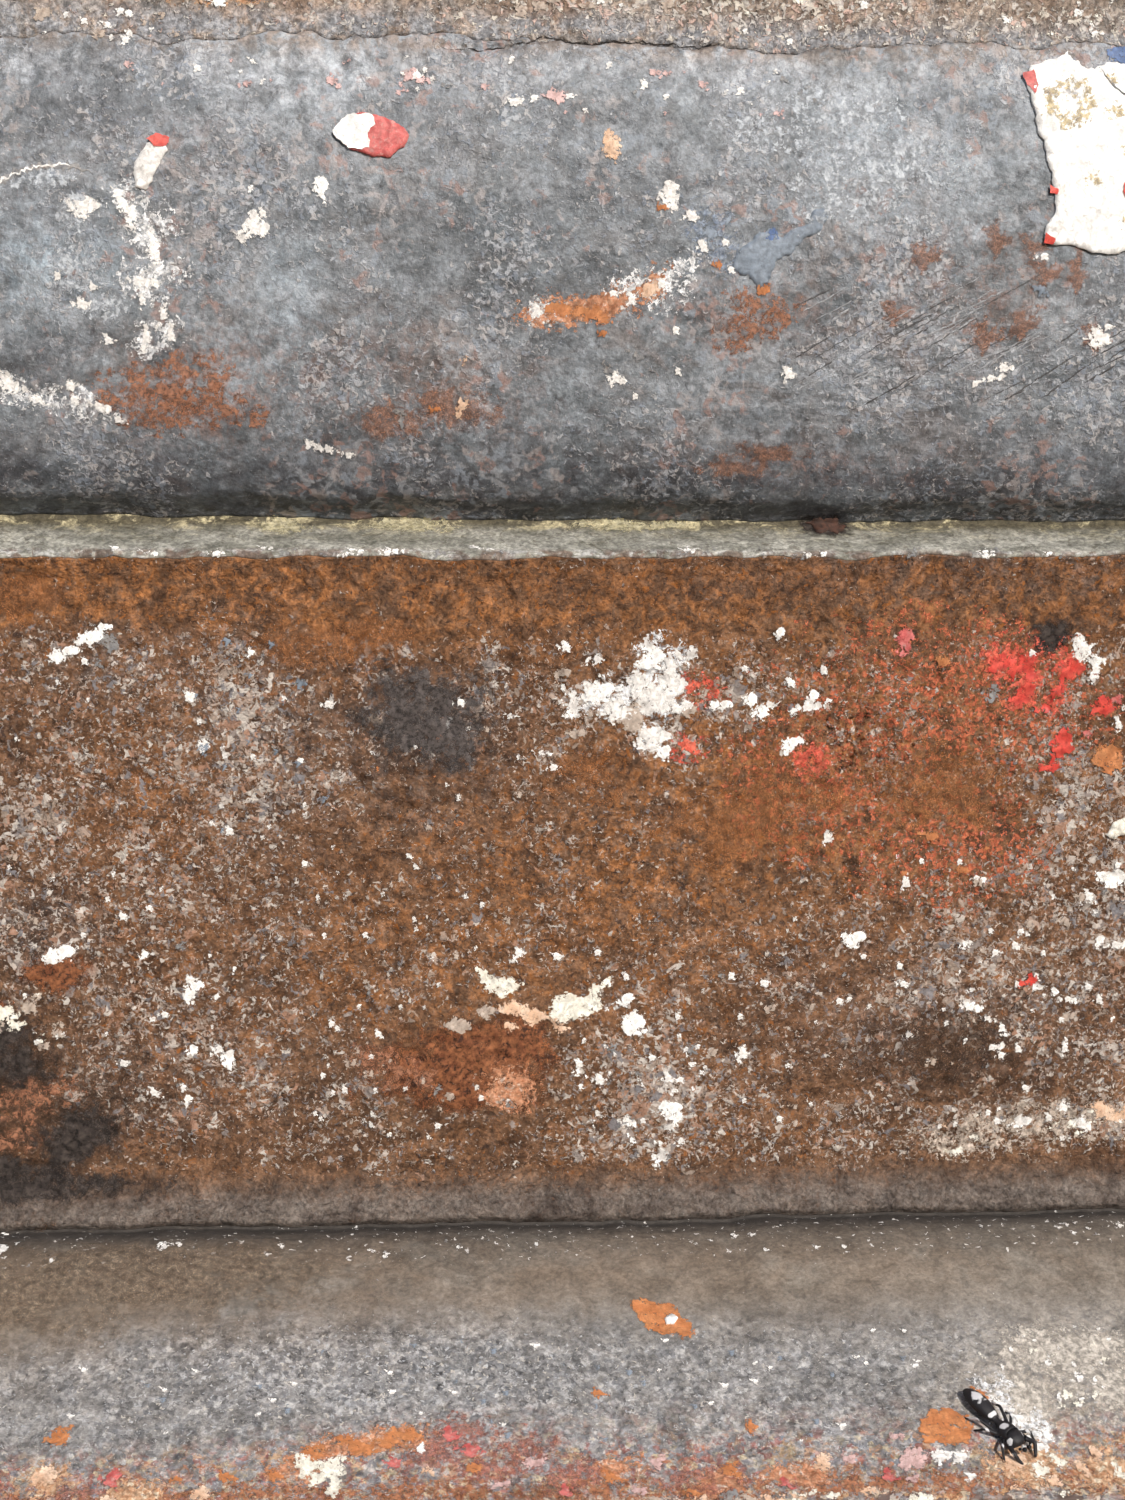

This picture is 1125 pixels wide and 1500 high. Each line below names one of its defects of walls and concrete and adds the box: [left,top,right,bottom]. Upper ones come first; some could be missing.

peeling [1023,0,1125,260]
peeling [0,364,129,425]
corrosion [86,349,271,438]
corrosion [19,954,93,995]
corrosion [0,1122,50,1157]
water stain [0,996,176,1208]
corrosion [347,1007,561,1119]
corrosion [145,1459,1124,1500]